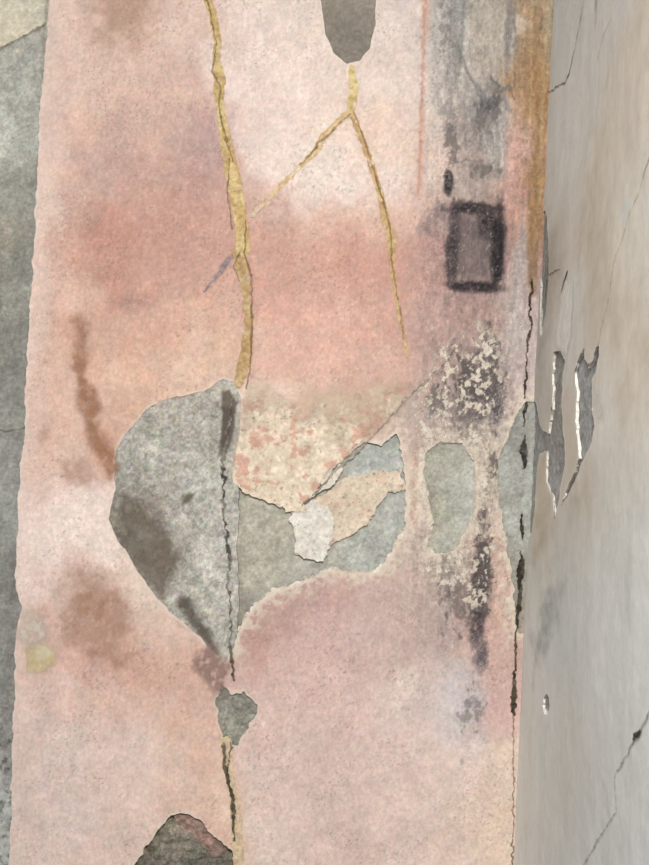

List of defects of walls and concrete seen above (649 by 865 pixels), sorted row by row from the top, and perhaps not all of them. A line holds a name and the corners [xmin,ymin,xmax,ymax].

peeling [321,0,376,64]
crack [203,0,408,681]
crack [520,279,534,469]
spalling [109,280,599,661]
crack [302,375,433,505]
spalling [135,813,234,865]
crack [220,736,245,865]
crack [510,514,525,865]
crack [614,714,648,778]